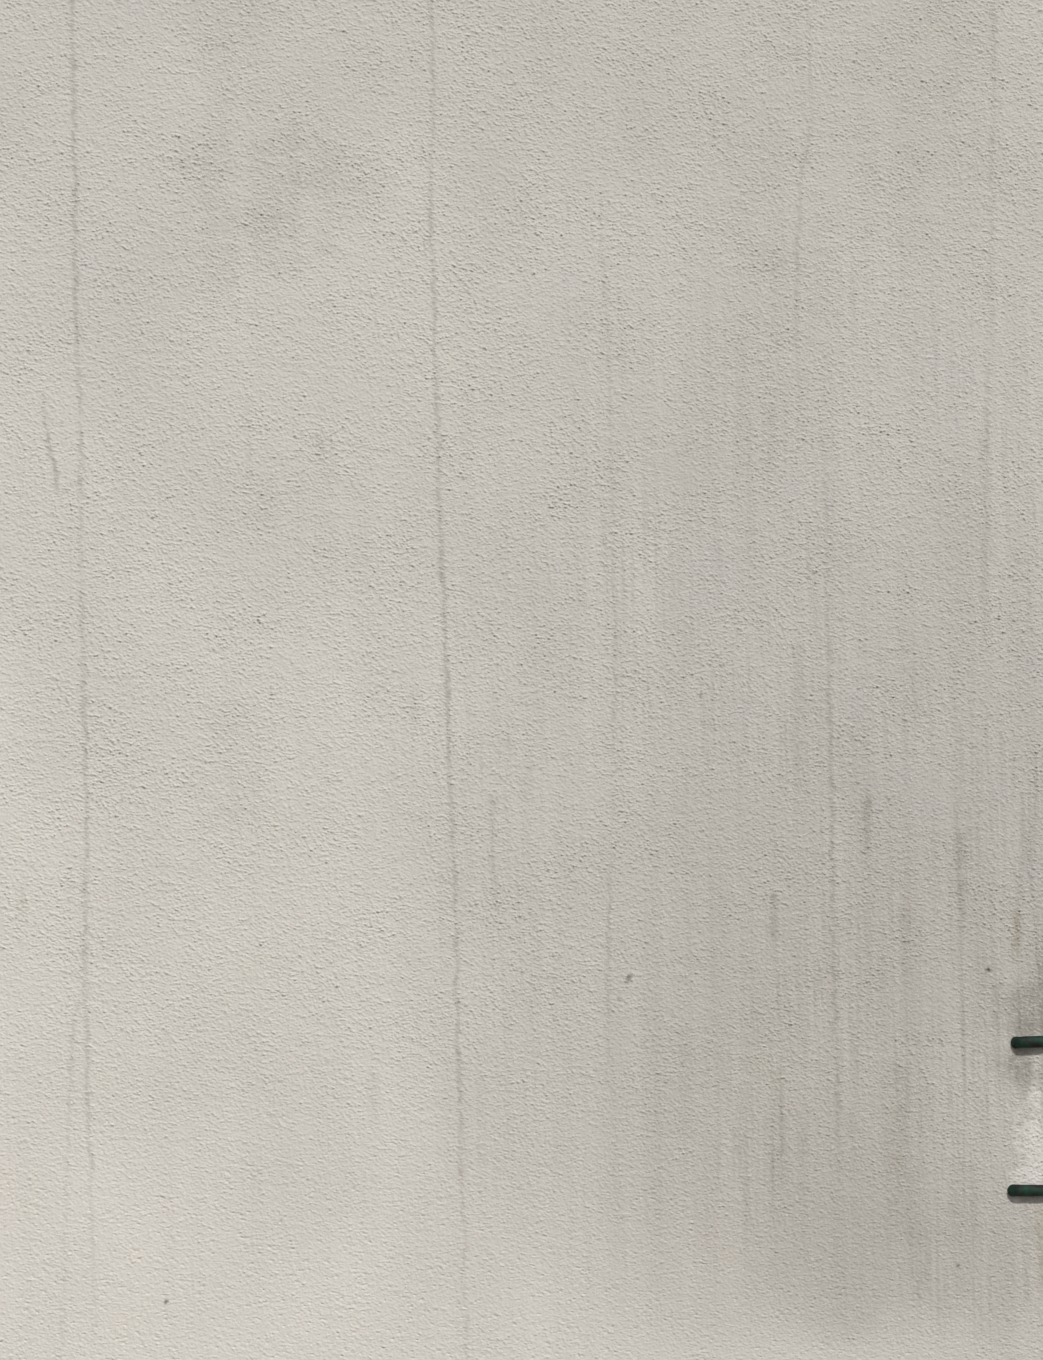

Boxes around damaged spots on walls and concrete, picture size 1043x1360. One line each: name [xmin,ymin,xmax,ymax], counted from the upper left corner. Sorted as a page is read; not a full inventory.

damp [1005,1057,1043,1203]